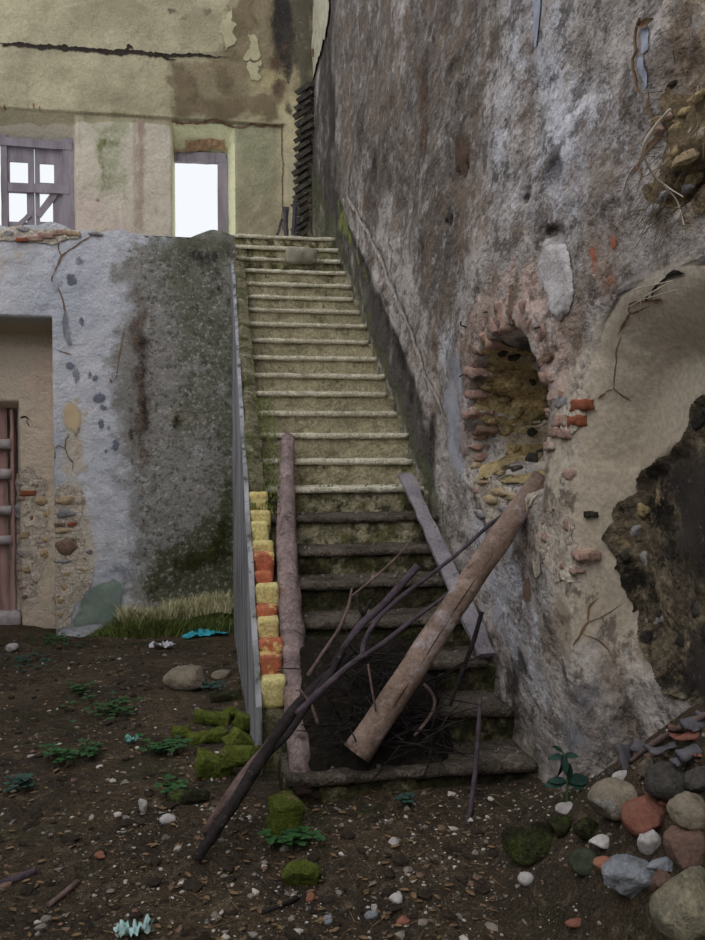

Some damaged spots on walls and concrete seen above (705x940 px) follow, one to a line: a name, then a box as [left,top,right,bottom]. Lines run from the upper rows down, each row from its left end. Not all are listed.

crack [0,41,222,61]
peeling [166,0,329,237]
leakage [271,0,296,83]
peeling [631,18,654,94]
spalling [642,80,705,217]
crack [54,435,73,469]
crack [51,235,92,355]
leakage [129,314,149,459]
flaking render [444,292,595,522]
crack [598,270,685,402]
flaking render [14,463,94,632]
spalling [523,395,705,706]